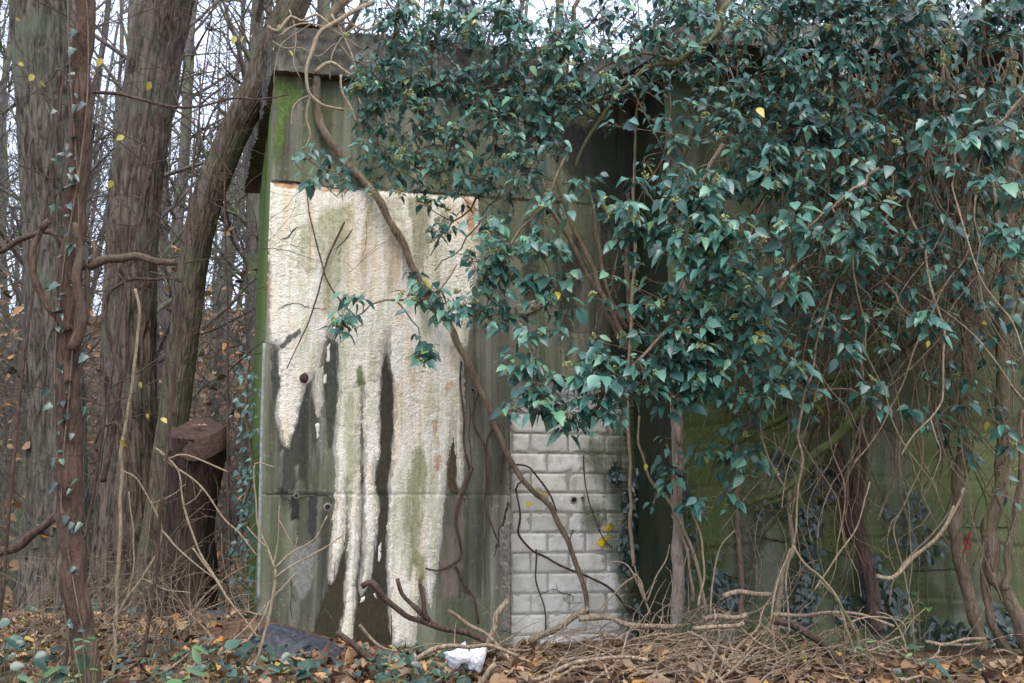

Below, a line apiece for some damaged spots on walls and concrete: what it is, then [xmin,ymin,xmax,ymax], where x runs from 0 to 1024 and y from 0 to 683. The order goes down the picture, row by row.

damp [267,132,481,647]